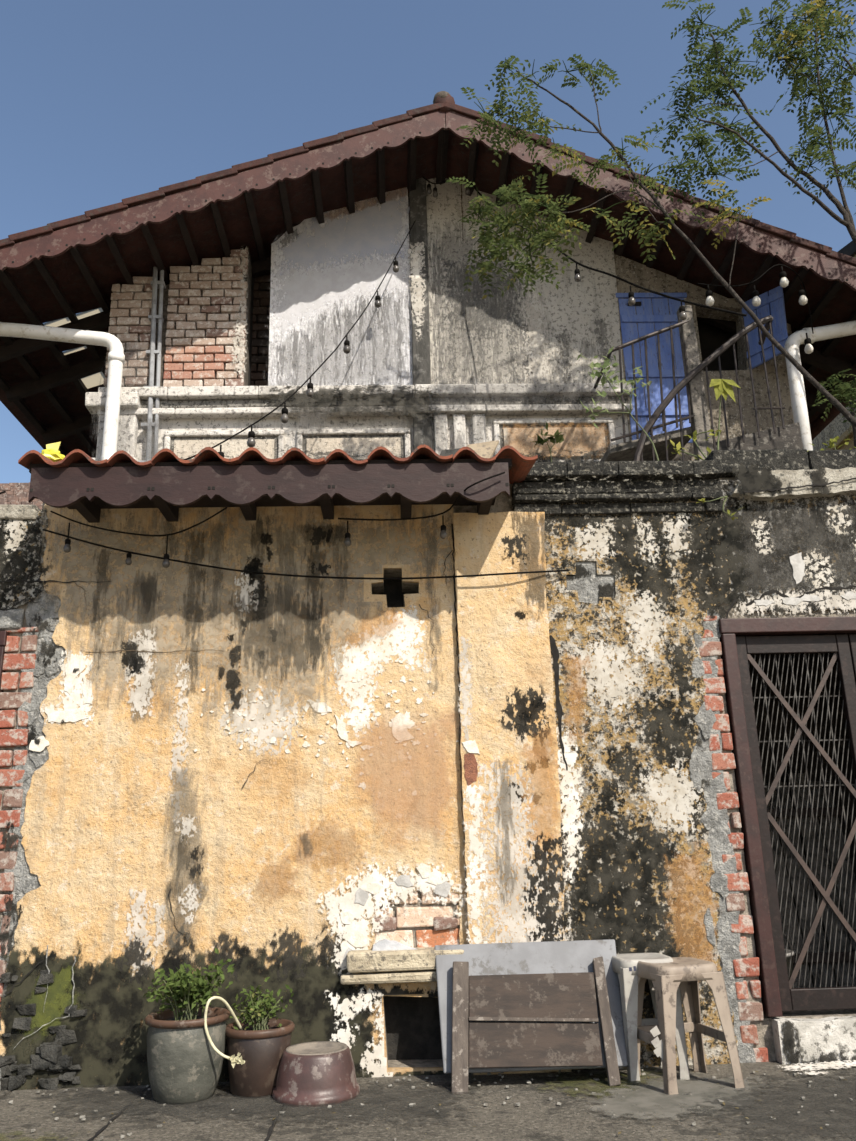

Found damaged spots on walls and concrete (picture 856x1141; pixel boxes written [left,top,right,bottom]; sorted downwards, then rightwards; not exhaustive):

water stain [271,242,427,337]
spalling [752,518,773,554]
spalling [827,501,856,548]
peeling [201,605,438,789]
water stain [464,450,856,957]
spalling [0,583,95,1038]
water stain [0,508,452,1091]
spalling [689,551,856,1063]
peeling [316,862,466,974]
peeling [326,988,394,1077]
water stain [642,979,654,1019]
water stain [698,983,712,1013]